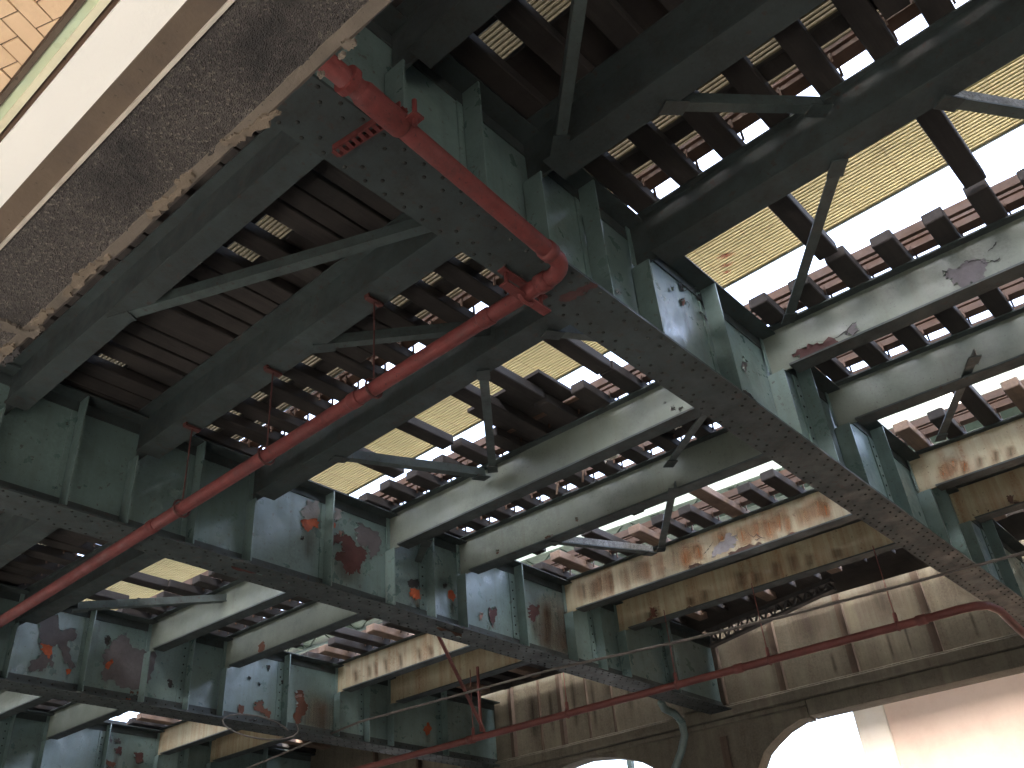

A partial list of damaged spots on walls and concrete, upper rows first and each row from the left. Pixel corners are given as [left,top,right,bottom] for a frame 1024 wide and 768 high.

peeling [942,258,990,288]
peeling [300,499,320,540]
peeling [333,507,382,576]
peeling [407,579,422,600]
peeling [28,614,77,675]
peeling [101,632,157,700]